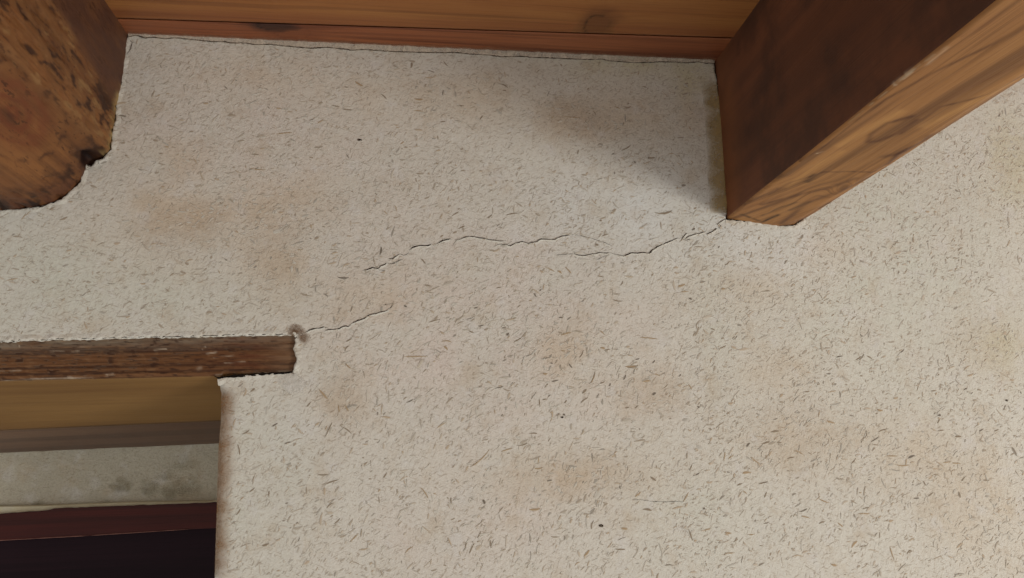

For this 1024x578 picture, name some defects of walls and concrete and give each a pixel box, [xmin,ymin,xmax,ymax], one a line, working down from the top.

crack [363,219,726,272]
crack [306,304,393,334]